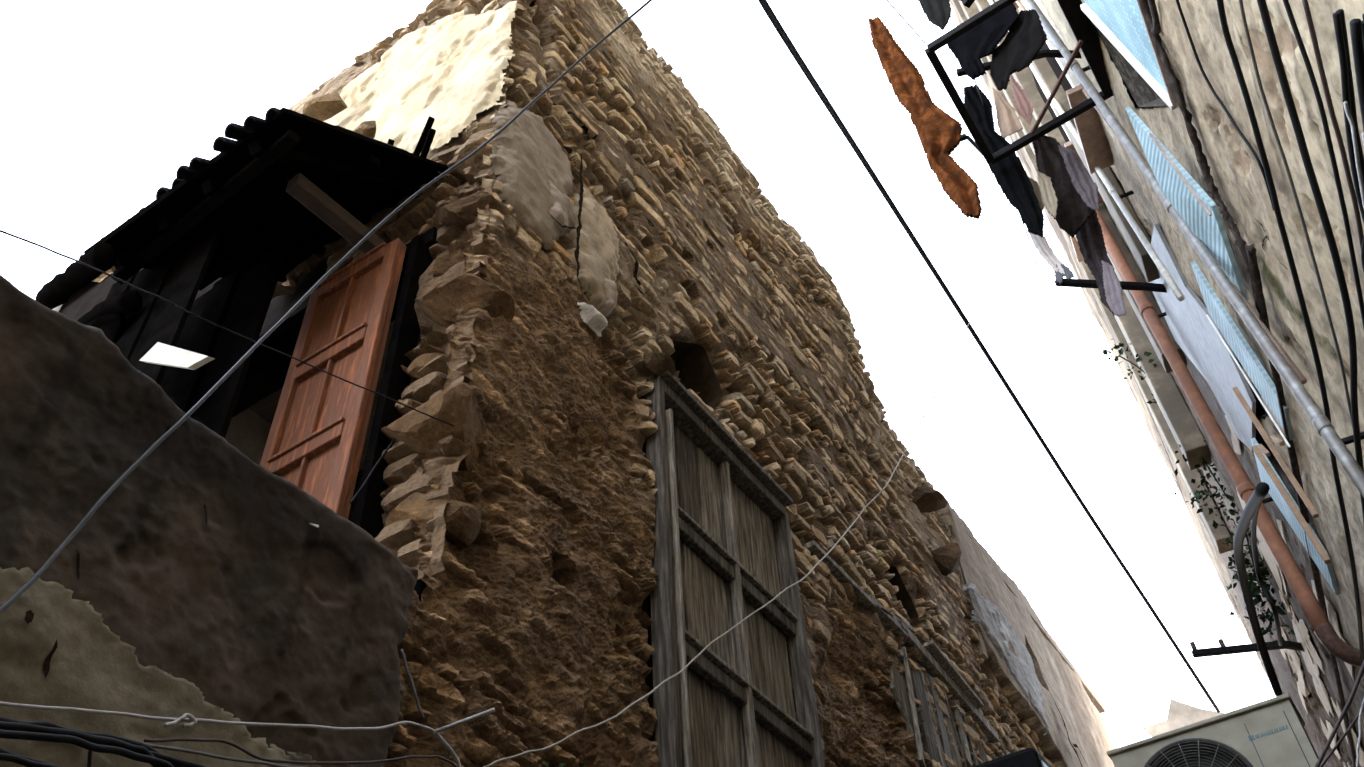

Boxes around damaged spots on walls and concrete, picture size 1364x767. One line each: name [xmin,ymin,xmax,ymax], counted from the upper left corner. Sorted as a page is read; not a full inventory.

spalling [289,0,525,114]
crack [549,102,597,298]
crack [617,227,644,310]
spalling [384,102,660,767]
peeling [0,567,320,767]
spalling [814,593,919,767]